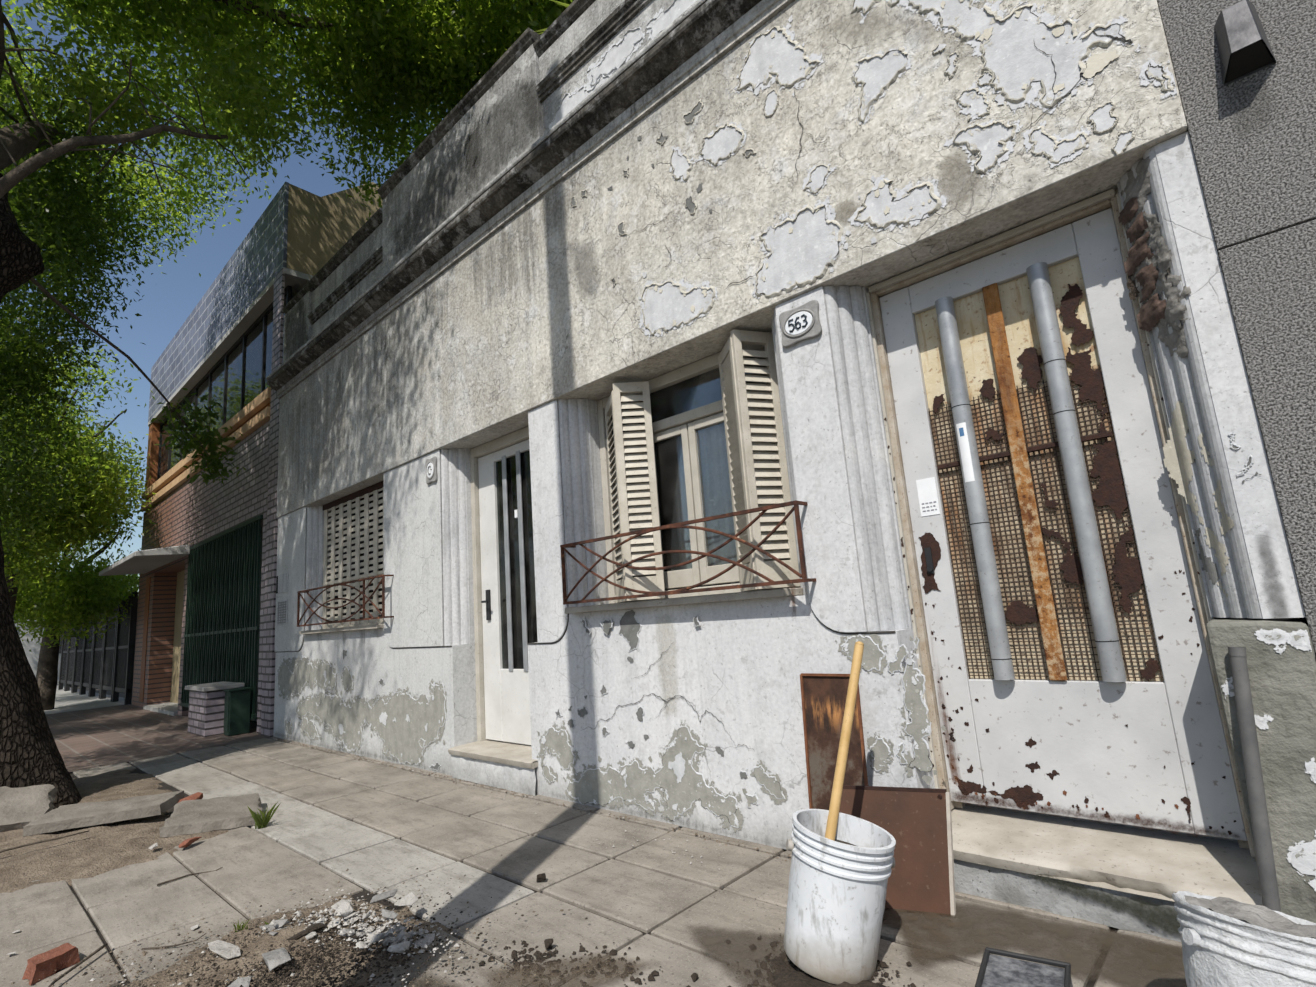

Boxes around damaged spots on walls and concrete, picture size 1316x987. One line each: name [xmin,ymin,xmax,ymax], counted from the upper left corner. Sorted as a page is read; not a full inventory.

peeling [734,15,824,117]
peeling [849,0,1177,179]
peeling [751,163,947,301]
spalling [1118,156,1191,359]
corrosion [1017,347,1043,393]
corrosion [1005,600,1038,625]
corrosion [1040,480,1059,508]
corrosion [1041,527,1084,585]
peeling [278,648,447,772]
crack [582,643,751,749]
peeling [835,634,946,785]
peeling [537,685,788,870]